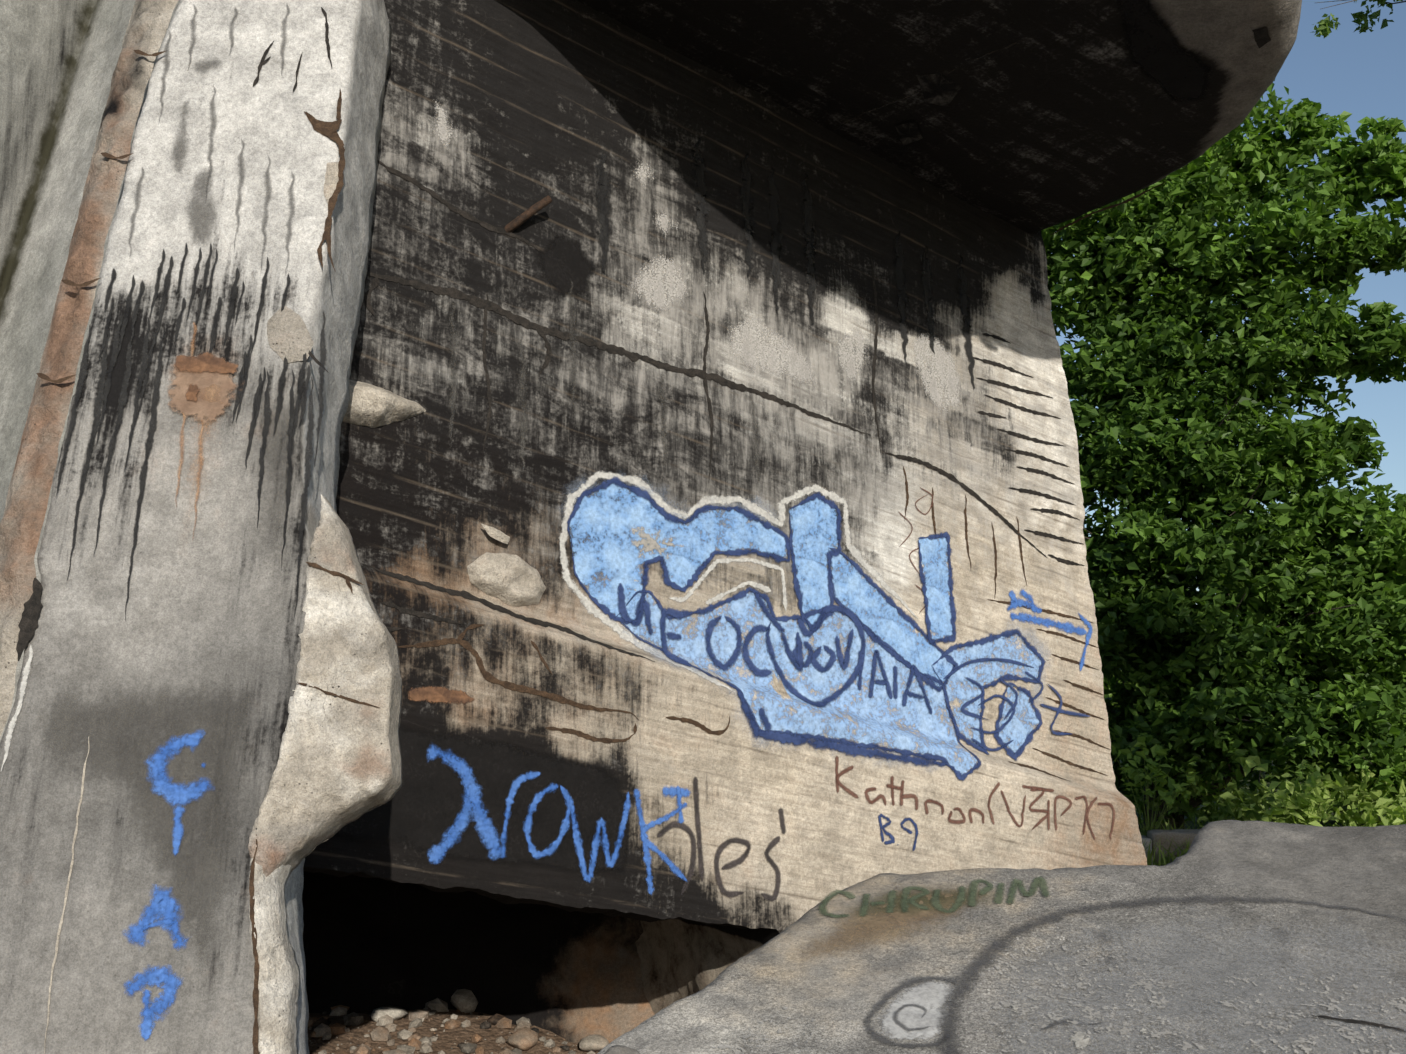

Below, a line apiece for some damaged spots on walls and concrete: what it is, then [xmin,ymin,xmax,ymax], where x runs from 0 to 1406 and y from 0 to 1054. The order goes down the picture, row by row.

water stain [55,96,327,621]
corrosion [168,323,238,536]
water stain [436,107,457,146]
water stain [595,154,612,274]
water stain [636,164,654,185]
water stain [630,256,687,310]
water stain [655,214,677,235]
crack [253,7,1111,781]
water stain [739,152,785,314]
water stain [729,316,816,385]
water stain [837,332,867,380]
water stain [893,231,975,413]